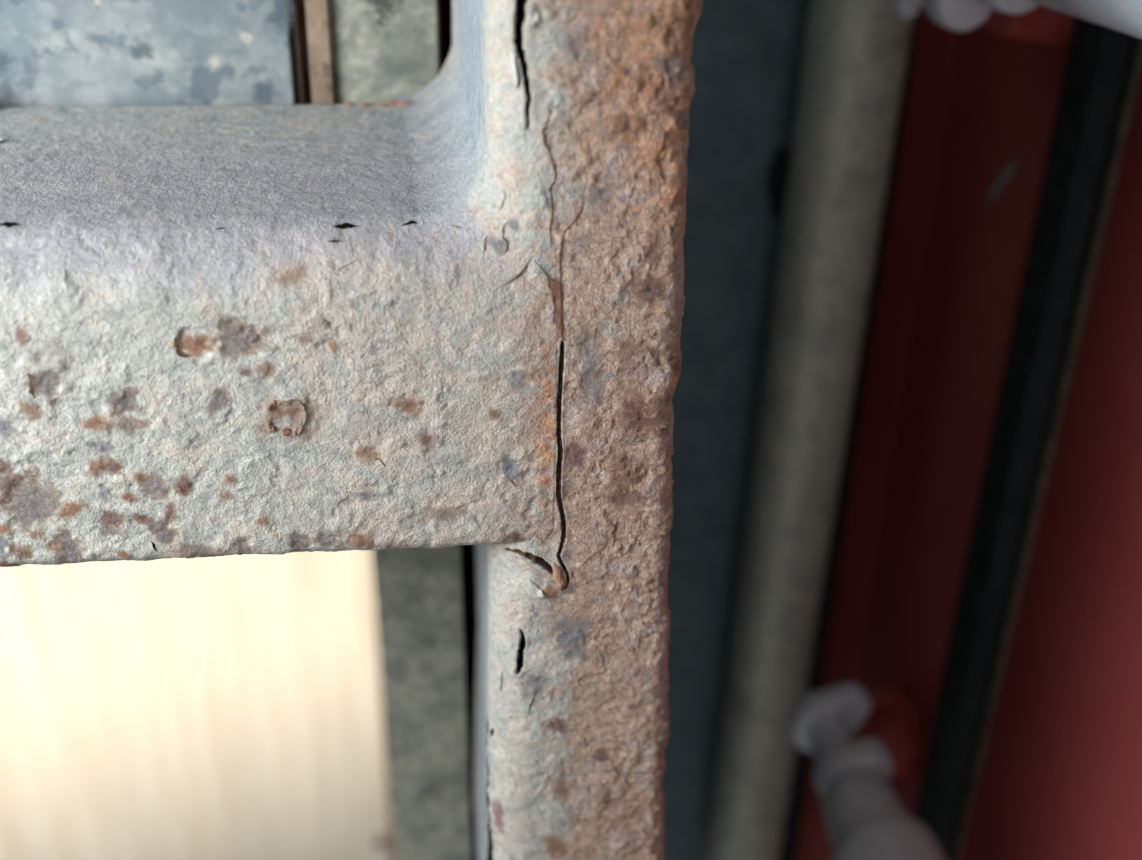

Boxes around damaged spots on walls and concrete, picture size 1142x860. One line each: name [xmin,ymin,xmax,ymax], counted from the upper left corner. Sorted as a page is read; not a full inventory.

crack [450,190,518,255]
crack [507,0,585,591]
corrosion [173,315,269,376]
corrosion [84,416,109,429]
corrosion [266,399,307,437]
corrosion [89,458,123,476]
corrosion [174,475,193,496]
corrosion [60,502,82,517]
corrosion [101,493,152,527]
corrosion [0,532,63,567]
crack [500,630,536,714]
crack [485,719,515,860]